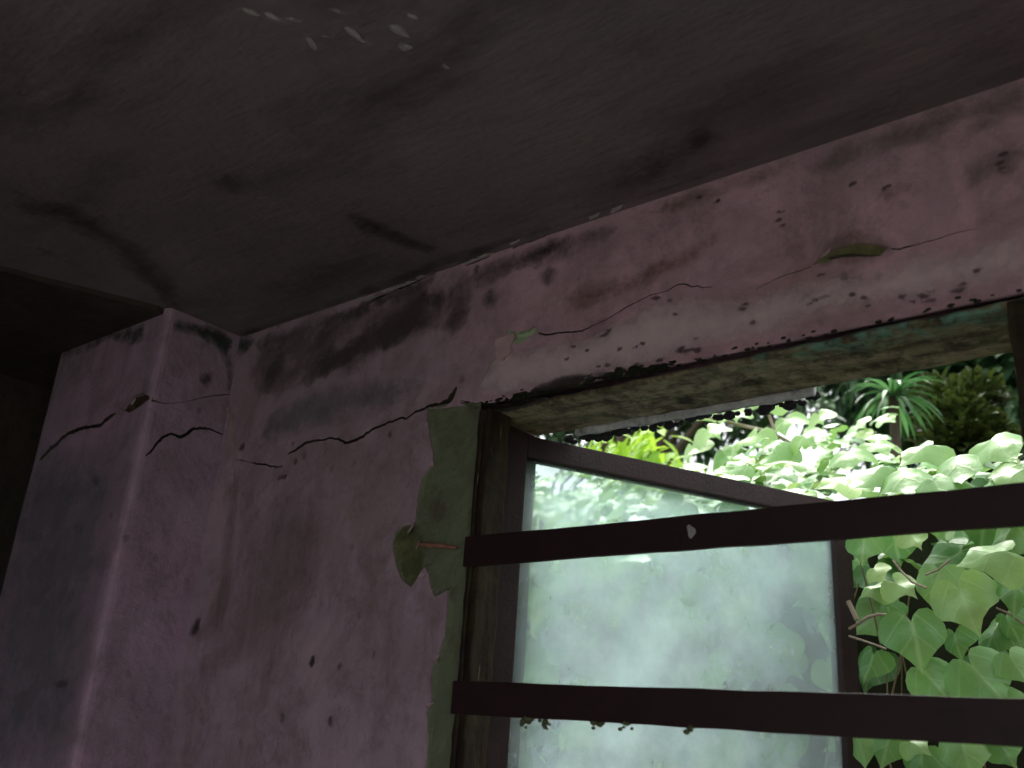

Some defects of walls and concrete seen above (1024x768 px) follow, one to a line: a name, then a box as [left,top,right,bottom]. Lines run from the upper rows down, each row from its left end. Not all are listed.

flaking render [815,244,894,265]
crack [891,229,973,250]
crack [537,283,713,336]
damp [258,286,464,386]
damp [532,363,618,393]
crack [39,413,116,460]
crack [145,426,223,456]
crack [240,387,549,468]
flaking render [393,402,482,768]